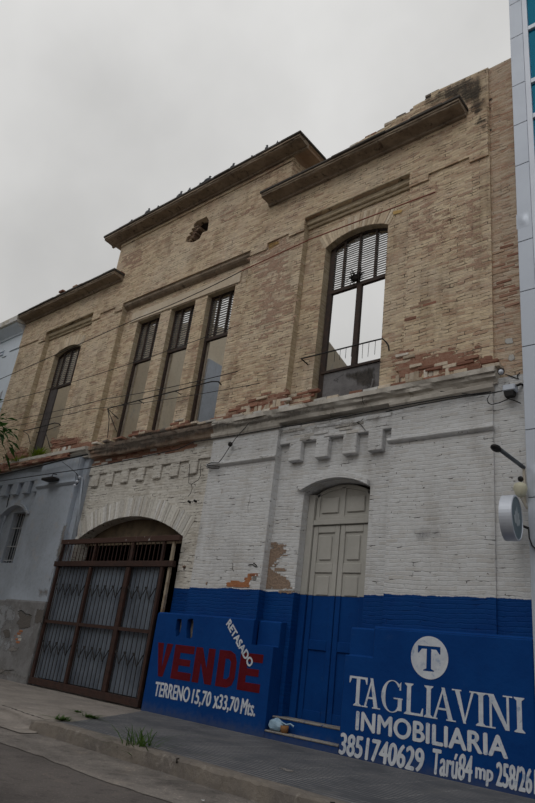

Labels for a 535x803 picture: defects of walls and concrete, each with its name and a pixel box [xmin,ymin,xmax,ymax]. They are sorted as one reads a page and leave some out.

leakage [424,77,492,124]
spalling [188,225,206,242]
peeling [391,343,499,379]
flaking render [210,388,321,420]
peeling [220,542,295,594]